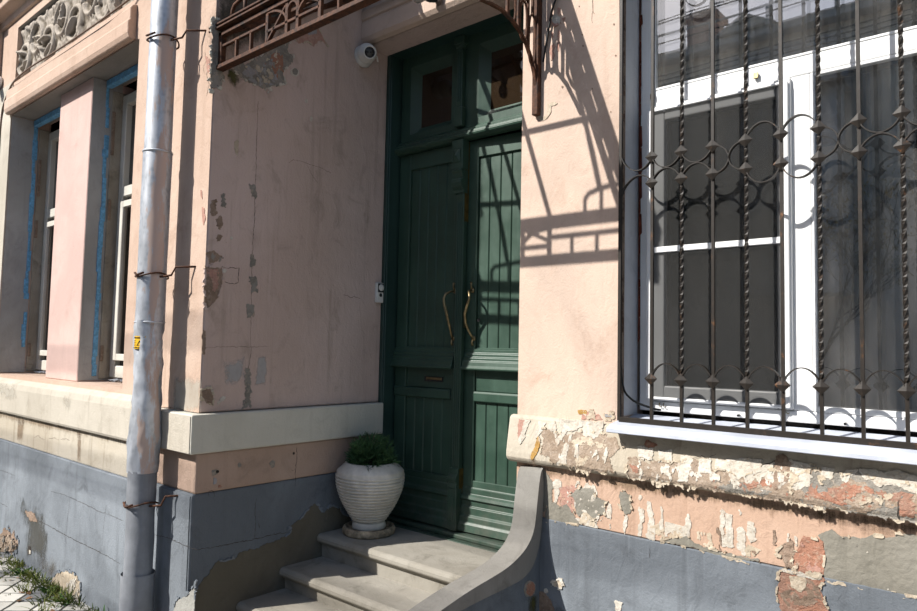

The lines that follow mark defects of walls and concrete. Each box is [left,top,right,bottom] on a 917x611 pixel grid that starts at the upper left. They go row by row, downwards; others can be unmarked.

peeling [207,16,329,94]
peeling [200,190,239,311]
peeling [517,409,917,565]
flaking render [0,525,20,558]
flaking render [50,569,82,599]
flaking render [772,530,846,611]